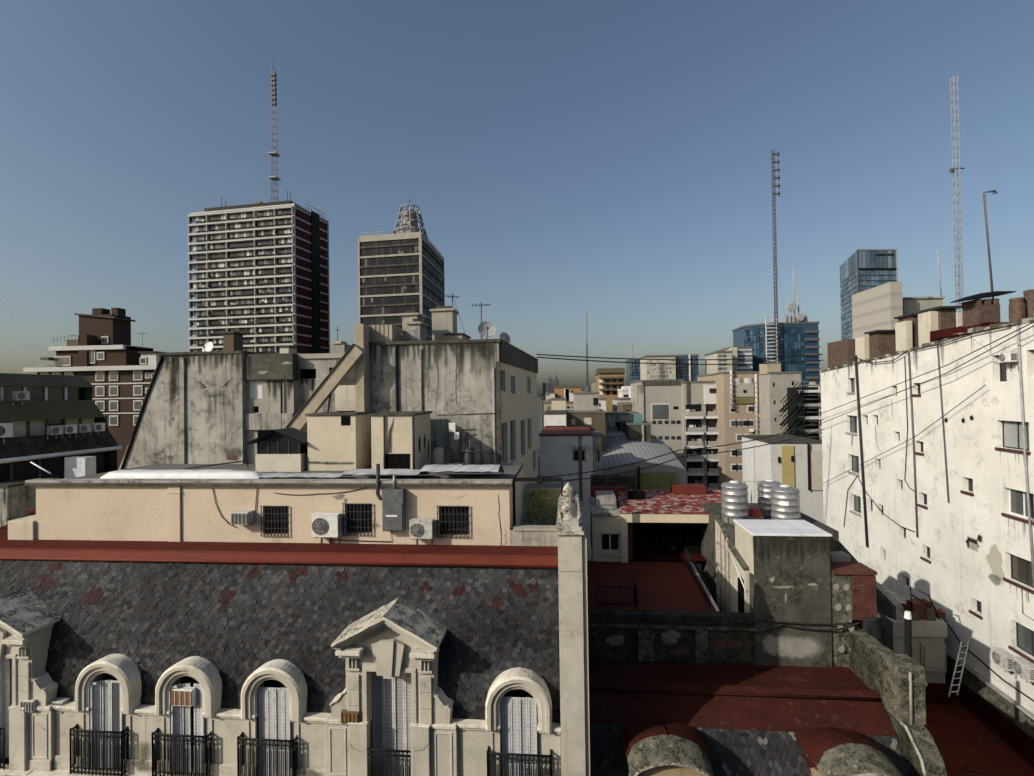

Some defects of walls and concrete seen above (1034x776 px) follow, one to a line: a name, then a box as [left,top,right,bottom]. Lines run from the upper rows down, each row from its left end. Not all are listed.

leakage [160,353,244,398]
leakage [369,343,495,368]